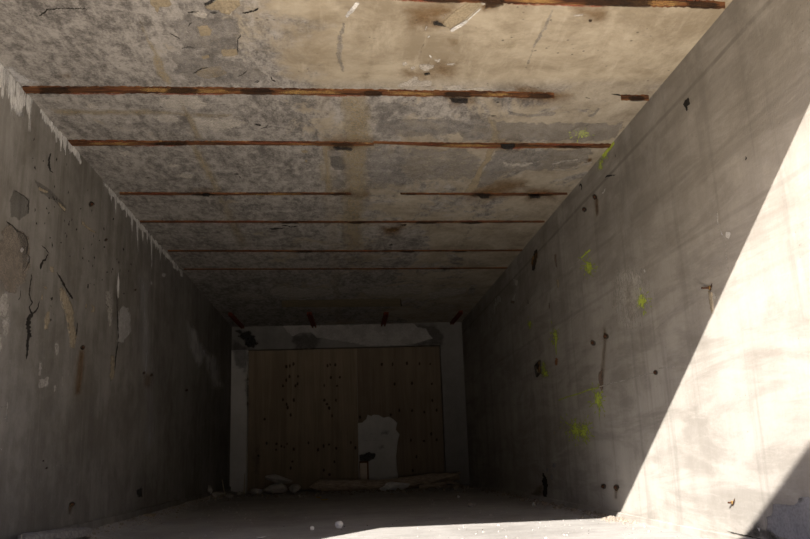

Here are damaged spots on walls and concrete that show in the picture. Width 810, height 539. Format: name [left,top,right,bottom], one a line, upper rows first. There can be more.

corrosion [480,0,504,8]
corrosion [515,0,651,22]
corrosion [445,92,471,104]
efflorescence [0,63,82,164]
corrosion [331,138,372,151]
spalling [0,221,30,352]
crack [18,244,89,359]